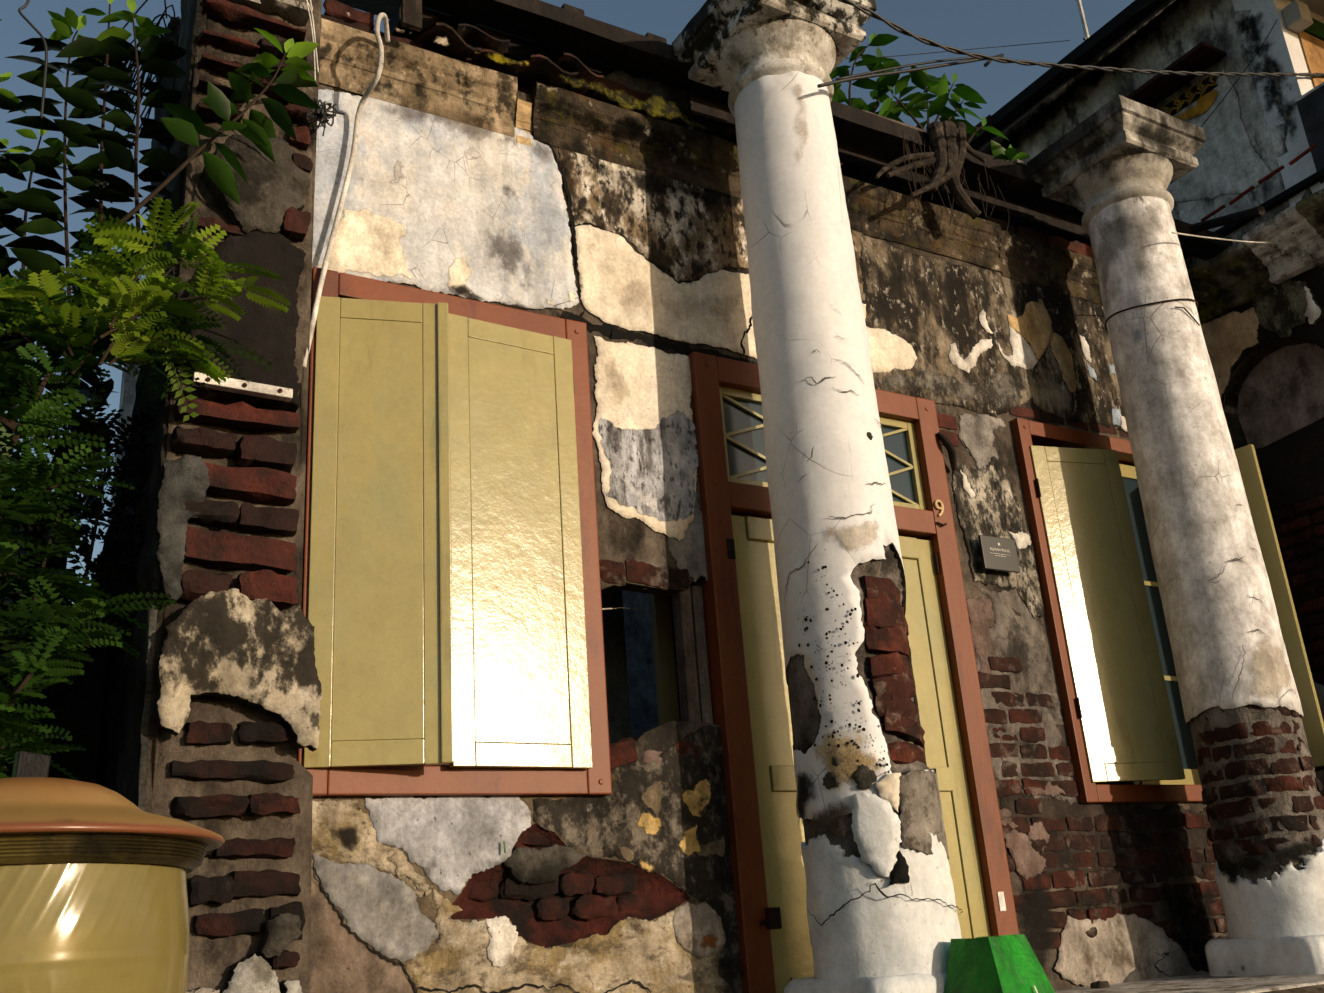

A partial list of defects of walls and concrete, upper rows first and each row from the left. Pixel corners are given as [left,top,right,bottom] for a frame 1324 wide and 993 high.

leakage [1236,13,1297,136]
leakage [595,164,738,208]
crack [801,304,884,436]
peeling [948,299,1116,393]
crack [784,482,886,600]
peeling [1007,531,1031,549]
spalling [787,655,821,754]
spalling [823,575,949,877]
flaking render [978,656,1324,973]
crack [313,866,651,993]
spalling [312,796,689,968]
crack [807,883,963,926]